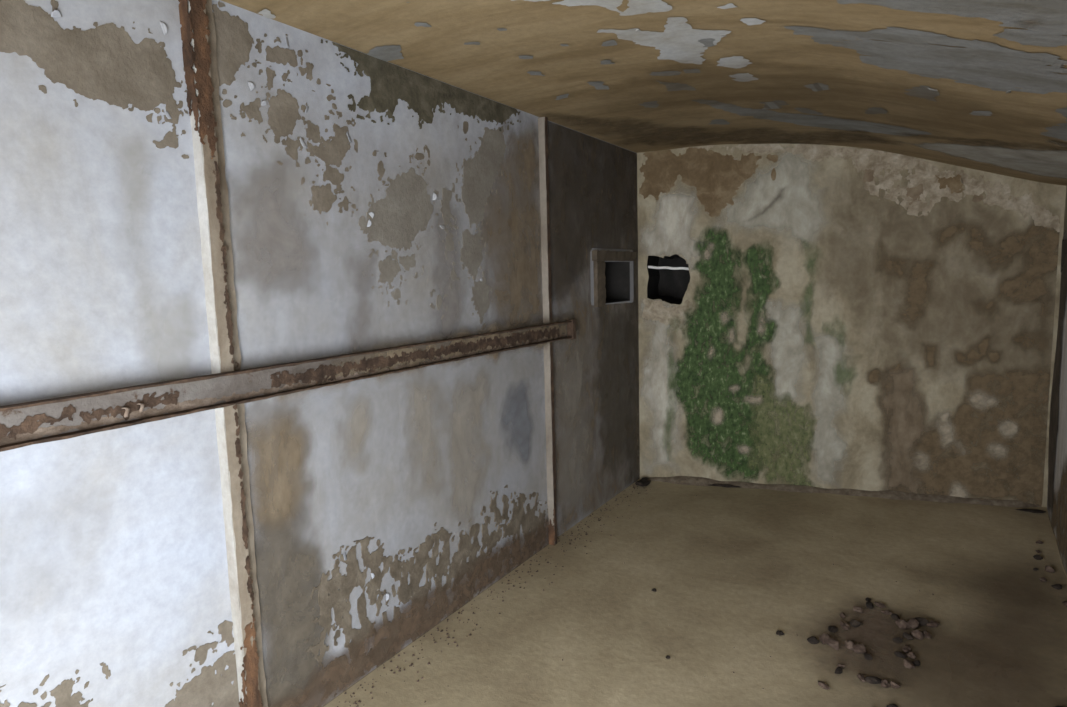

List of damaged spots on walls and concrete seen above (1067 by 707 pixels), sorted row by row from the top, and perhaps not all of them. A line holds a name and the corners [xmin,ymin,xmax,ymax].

peeling [0,0,189,159]
rust [178,0,234,364]
flaking render [511,0,1067,271]
damp [937,186,1067,351]
rust [0,391,180,440]
rust [270,318,570,399]
damp [239,39,934,707]
damp [867,336,1067,571]
peeling [0,670,93,707]
peeling [165,620,240,707]